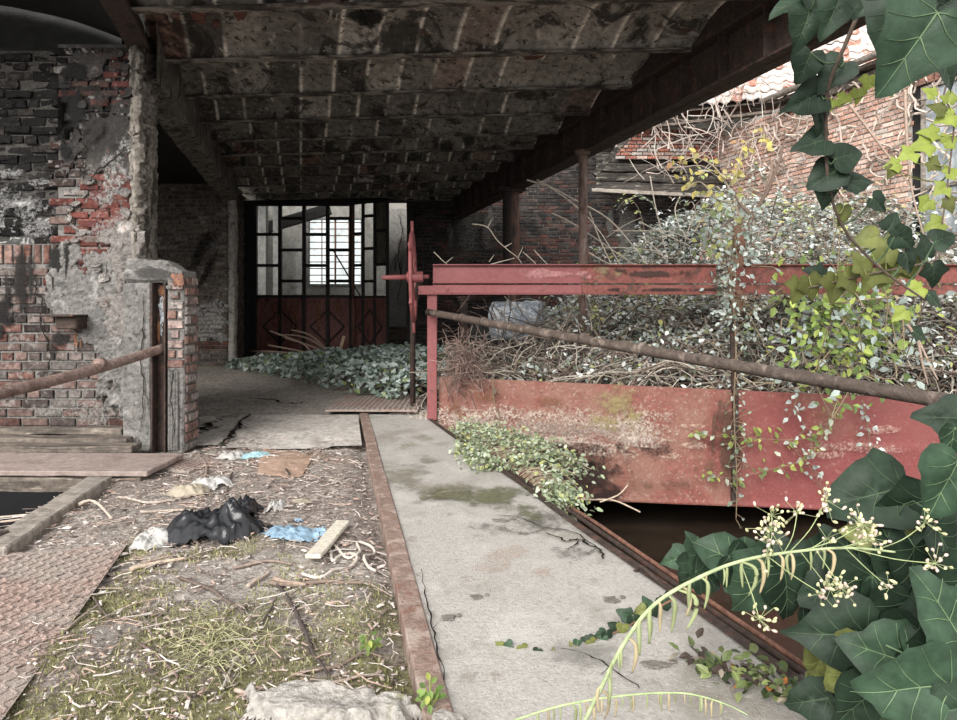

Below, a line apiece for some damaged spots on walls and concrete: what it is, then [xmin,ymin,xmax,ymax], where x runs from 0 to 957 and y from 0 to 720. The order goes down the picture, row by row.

flaking render [57,50,146,337]
crack [198,397,308,446]
rust [531,440,673,501]
rust [706,400,742,480]
crack [497,514,605,559]
crack [421,569,445,680]